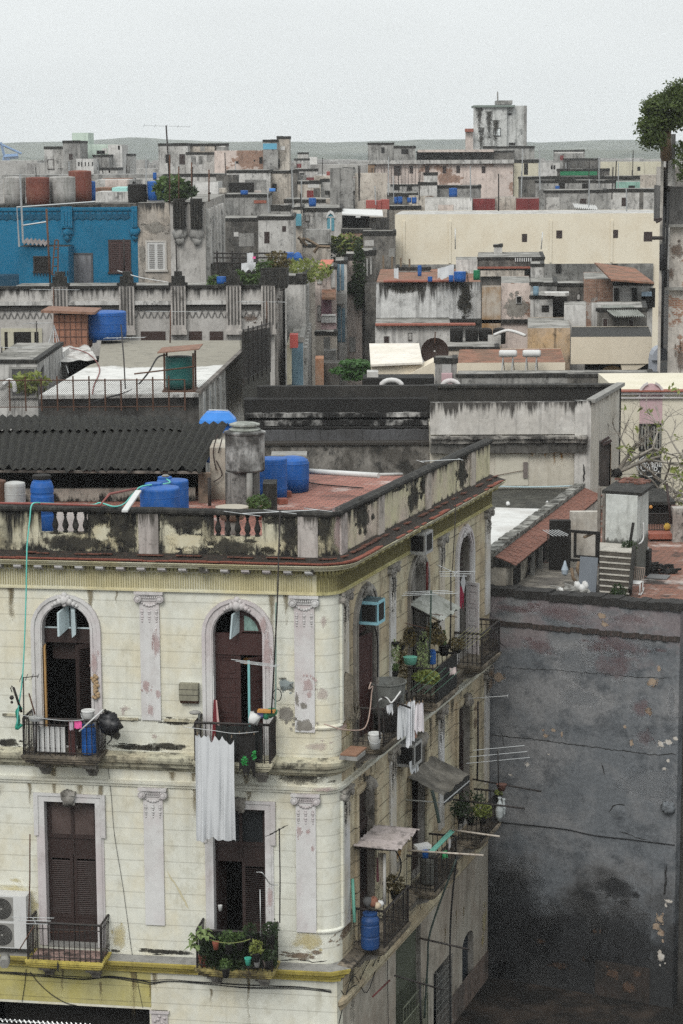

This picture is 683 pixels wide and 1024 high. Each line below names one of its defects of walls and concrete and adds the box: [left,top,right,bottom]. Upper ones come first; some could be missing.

leakage [387,282,421,294]
leakage [457,271,472,319]
leakage [456,455,468,488]
leakage [394,476,425,513]
leakage [43,512,137,552]
leakage [318,517,330,542]
leakage [355,498,377,535]
peeling [141,681,161,715]
spalling [278,675,319,731]
leakage [488,883,650,980]
spalling [653,899,673,943]